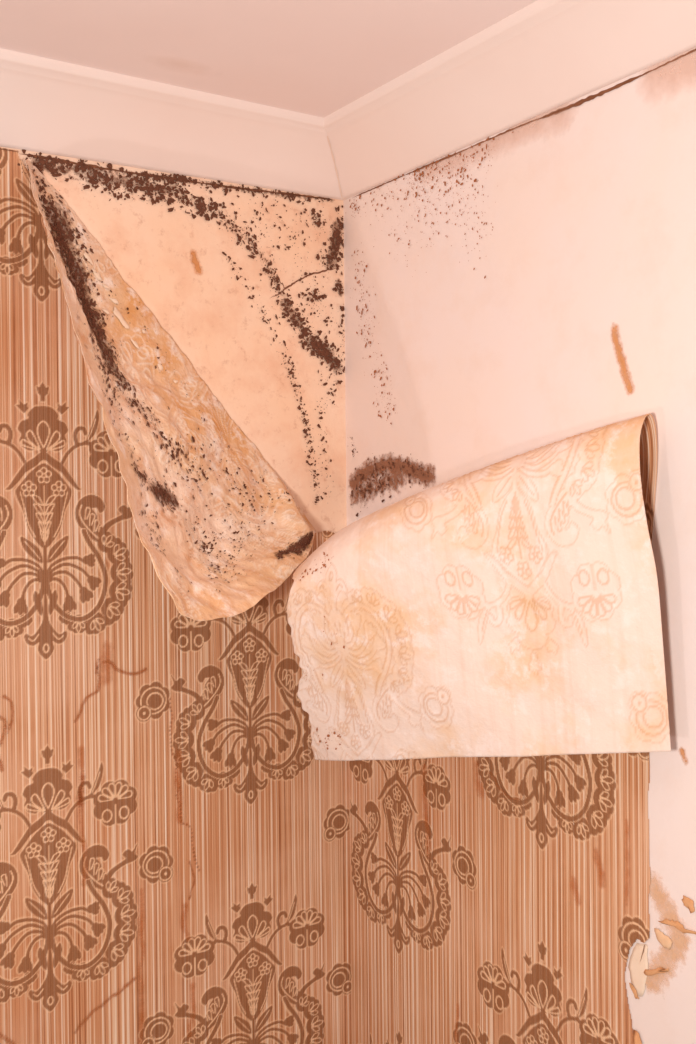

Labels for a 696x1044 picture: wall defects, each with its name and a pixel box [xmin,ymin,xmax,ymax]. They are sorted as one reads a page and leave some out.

crack [0,49,696,200]
peeling [83,252,146,349]
water stain [17,137,496,592]